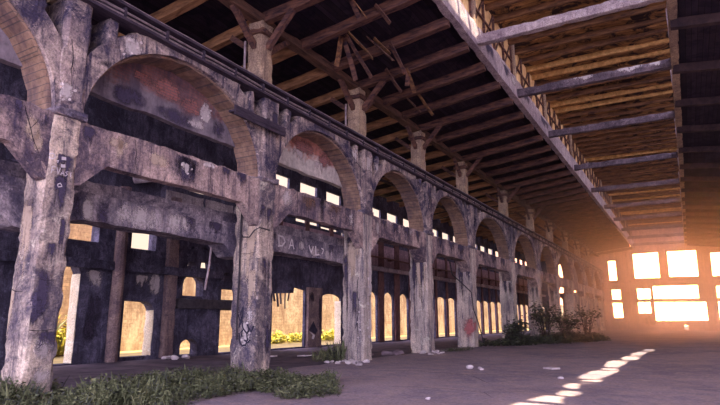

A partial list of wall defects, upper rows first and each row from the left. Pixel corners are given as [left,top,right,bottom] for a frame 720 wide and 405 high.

flaking render [134,70,212,129]
peeling [151,154,215,182]
flaking render [293,140,330,168]
damp [30,269,50,325]